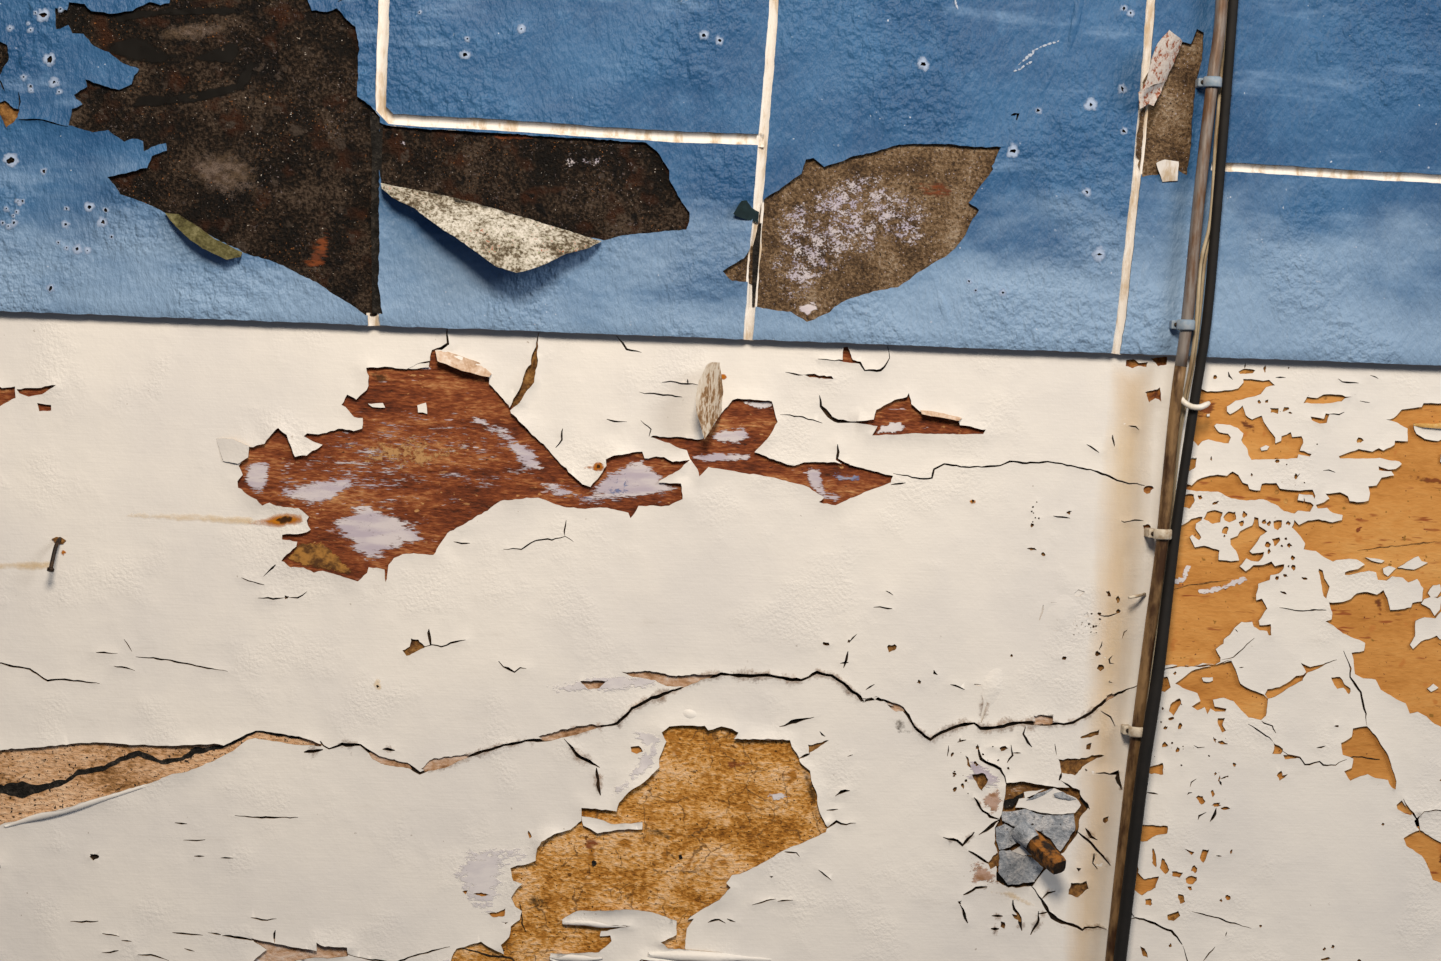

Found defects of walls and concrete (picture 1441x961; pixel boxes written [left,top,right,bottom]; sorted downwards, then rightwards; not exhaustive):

peeling [0,0,690,316]
peeling [723,144,1001,322]
peeling [1136,30,1203,182]
peeling [216,348,893,581]
crack [403,630,463,656]
peeling [1149,365,1441,775]
peeling [0,731,324,828]
crack [235,812,294,820]
peeling [451,725,830,961]
crack [304,662,1249,961]
crack [1248,722,1341,766]
crack [75,917,271,960]